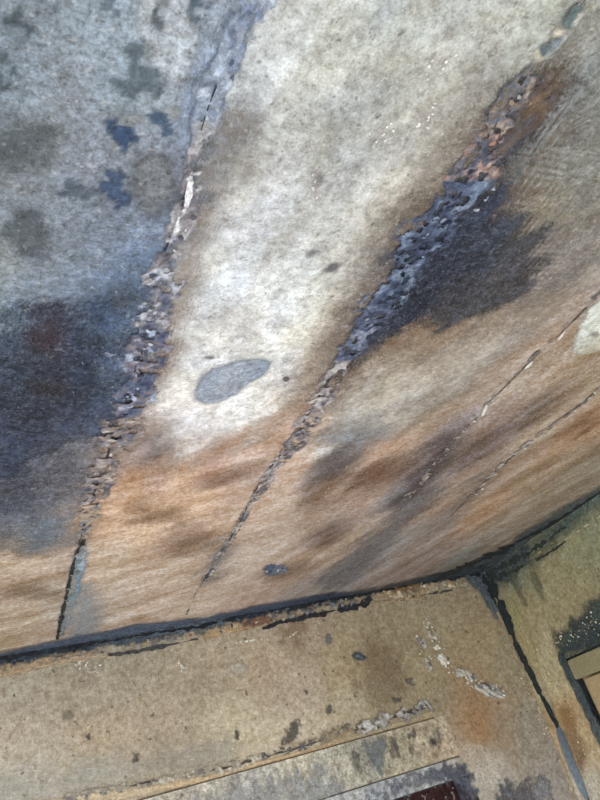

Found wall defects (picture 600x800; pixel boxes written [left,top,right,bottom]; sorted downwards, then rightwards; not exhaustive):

peeling [134,0,199,82]
leakage [0,0,242,350]
peeling [129,152,178,216]
crack [56,0,277,640]
rust [141,108,259,396]
crack [186,0,600,615]
leakage [0,283,600,656]
spalling [0,651,108,677]
spalling [189,608,314,644]
spalling [372,578,468,605]
peeling [415,617,506,699]
spalling [57,689,449,800]